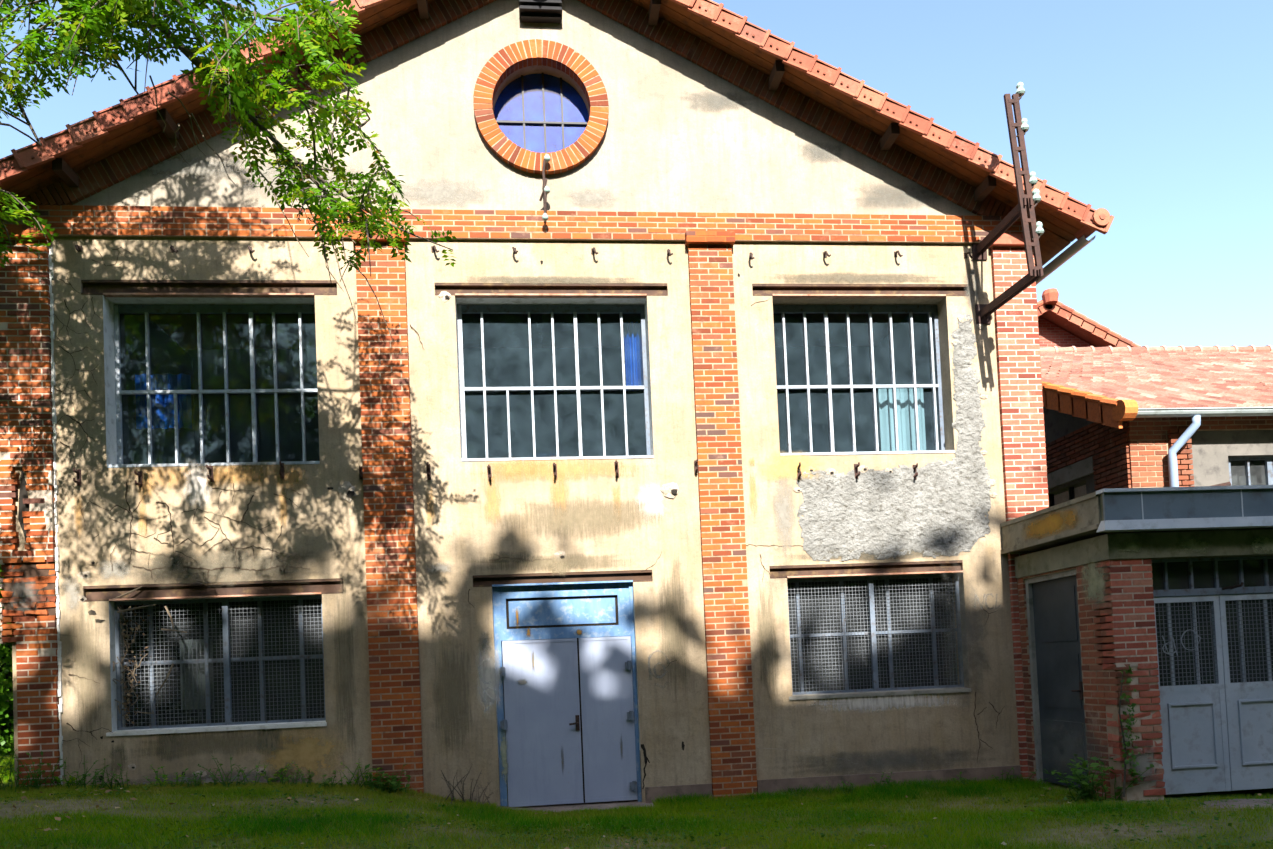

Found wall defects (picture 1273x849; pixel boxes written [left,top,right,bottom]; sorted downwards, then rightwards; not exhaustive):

crack [81,480,307,580]
rust [140,466,268,531]
rust [503,461,613,510]
peeling [793,314,998,561]